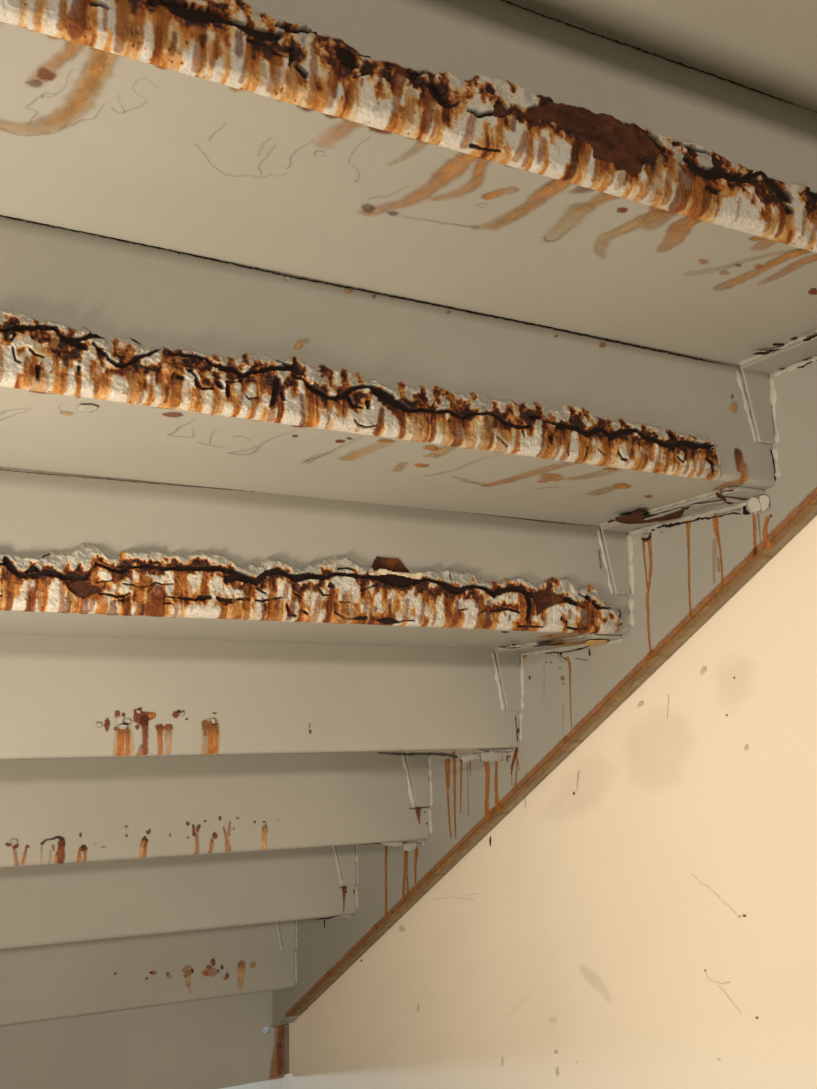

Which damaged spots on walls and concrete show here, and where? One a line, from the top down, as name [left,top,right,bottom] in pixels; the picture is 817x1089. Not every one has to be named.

rust [34,36,116,131]
peeling [0,0,817,253]
rust [405,153,505,205]
rust [501,179,701,247]
crack [0,215,730,366]
peeling [0,309,769,540]
crack [730,395,738,413]
peeling [0,543,622,685]
rust [96,707,188,756]
rust [202,712,219,754]
rust [271,488,817,1078]
rust [6,836,65,866]